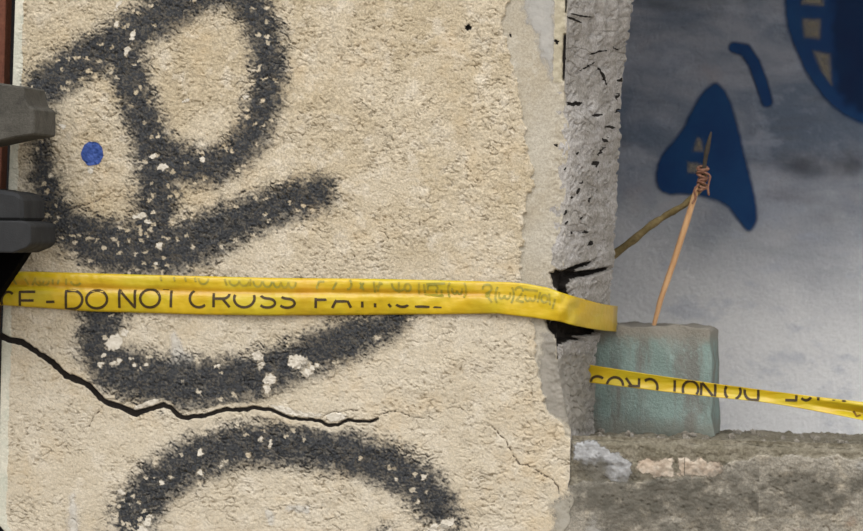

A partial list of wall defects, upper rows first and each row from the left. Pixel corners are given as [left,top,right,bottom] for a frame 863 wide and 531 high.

crack [562,0,619,85]
crack [0,334,423,427]